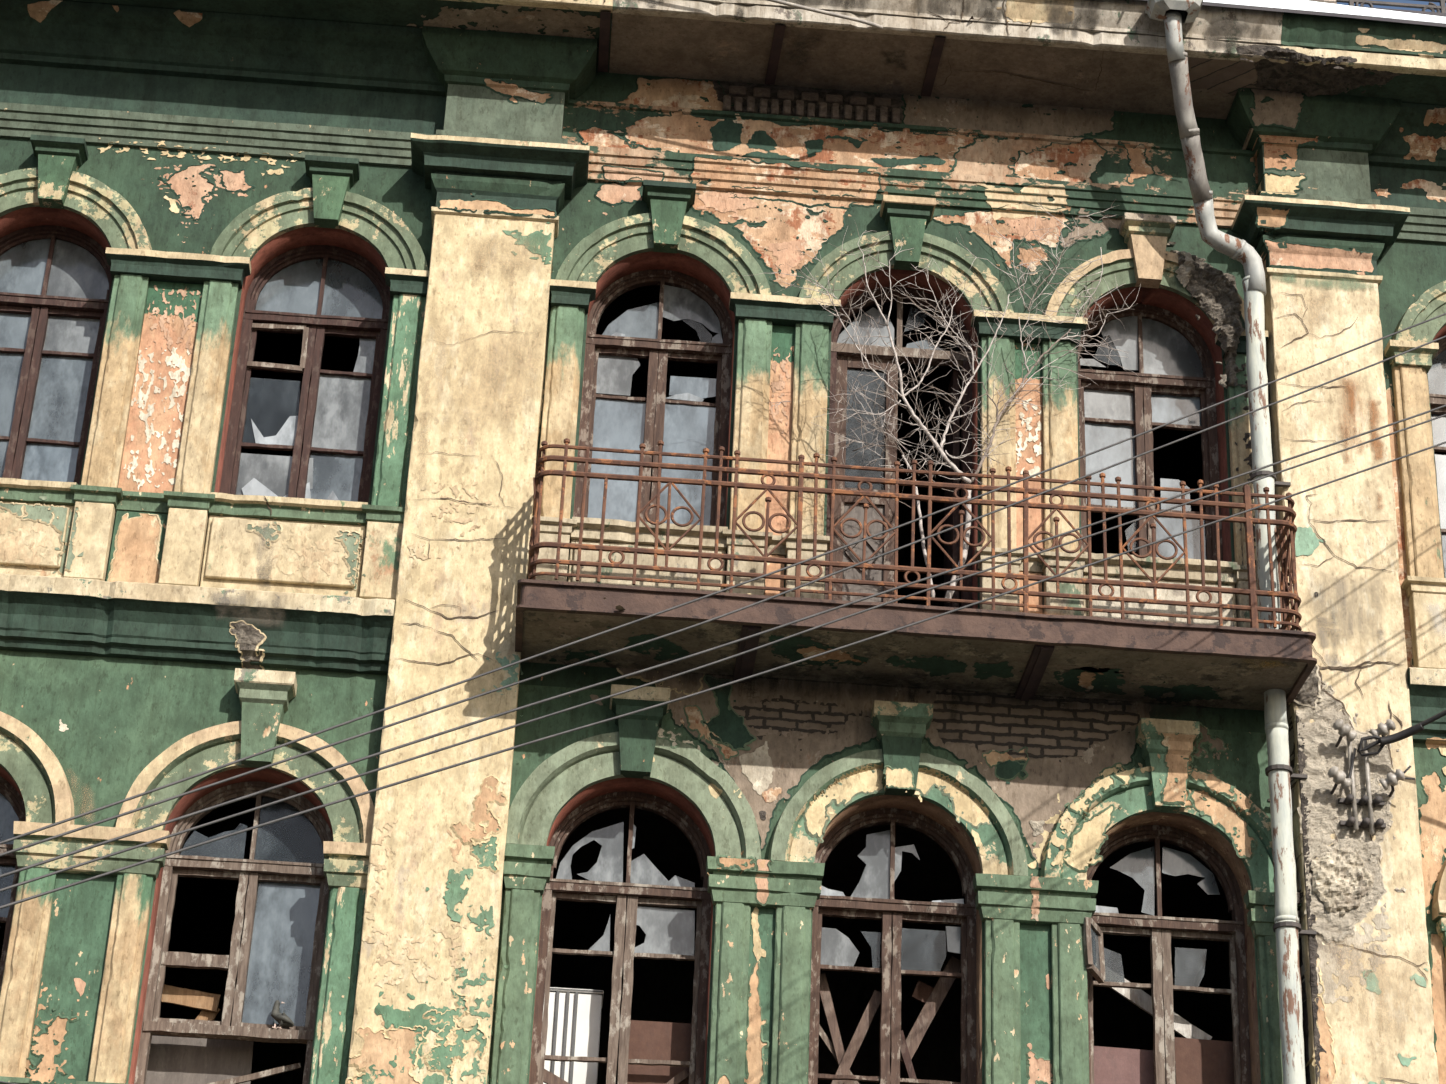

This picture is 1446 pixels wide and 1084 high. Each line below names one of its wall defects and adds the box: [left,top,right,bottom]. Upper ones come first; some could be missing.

peeling [97,138,304,243]
peeling [577,76,1155,296]
crack [1277,292,1358,346]
crack [1271,382,1347,448]
crack [1302,494,1393,572]
crack [1312,645,1404,769]
flaking render [616,632,1270,1084]
crack [1291,779,1381,864]
spalling [1286,664,1407,1084]
peeling [1418,737,1446,914]
peeling [25,978,86,1084]
peeling [332,1021,495,1084]